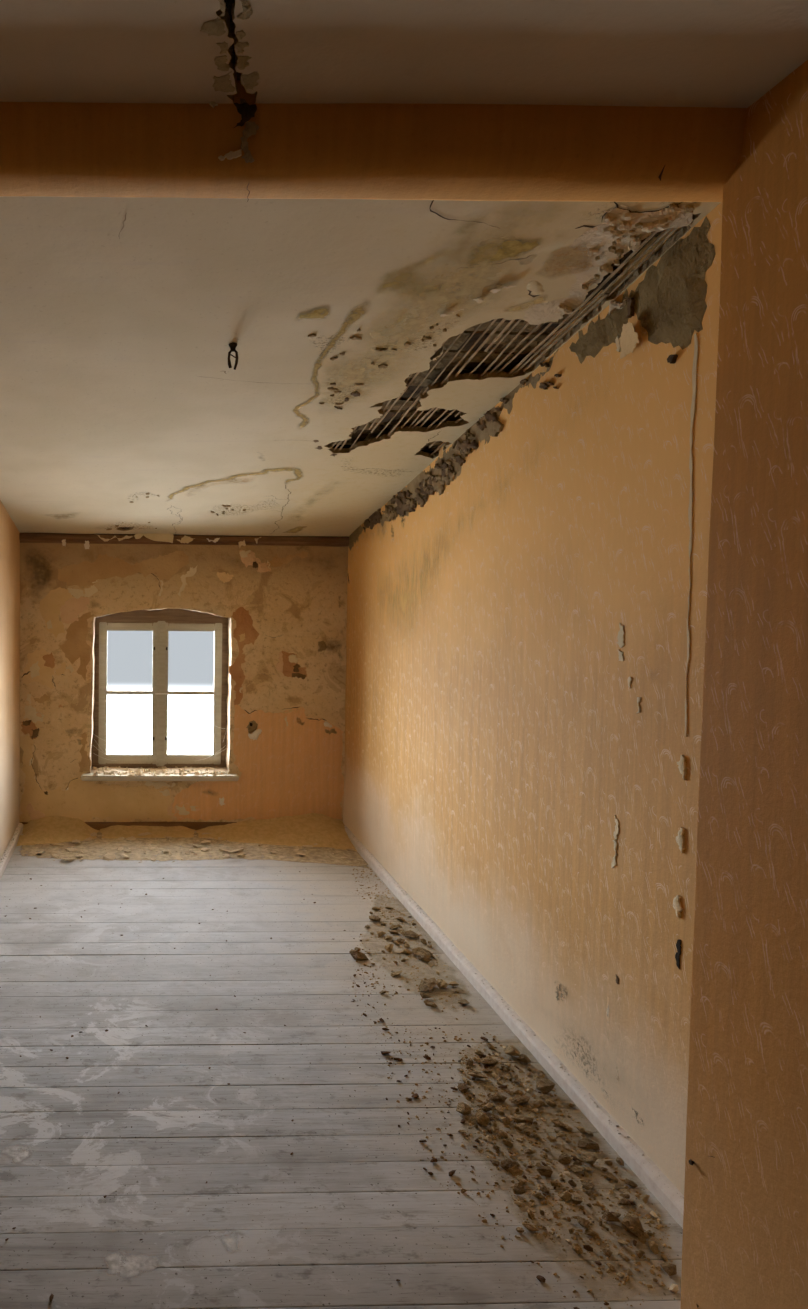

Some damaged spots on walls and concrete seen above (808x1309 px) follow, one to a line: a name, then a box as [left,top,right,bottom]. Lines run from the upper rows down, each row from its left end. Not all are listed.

water stain [293,239,538,427]
spalling [308,202,715,550]
water stain [169,468,302,499]
spalling [276,651,307,679]
spalling [246,720,262,740]